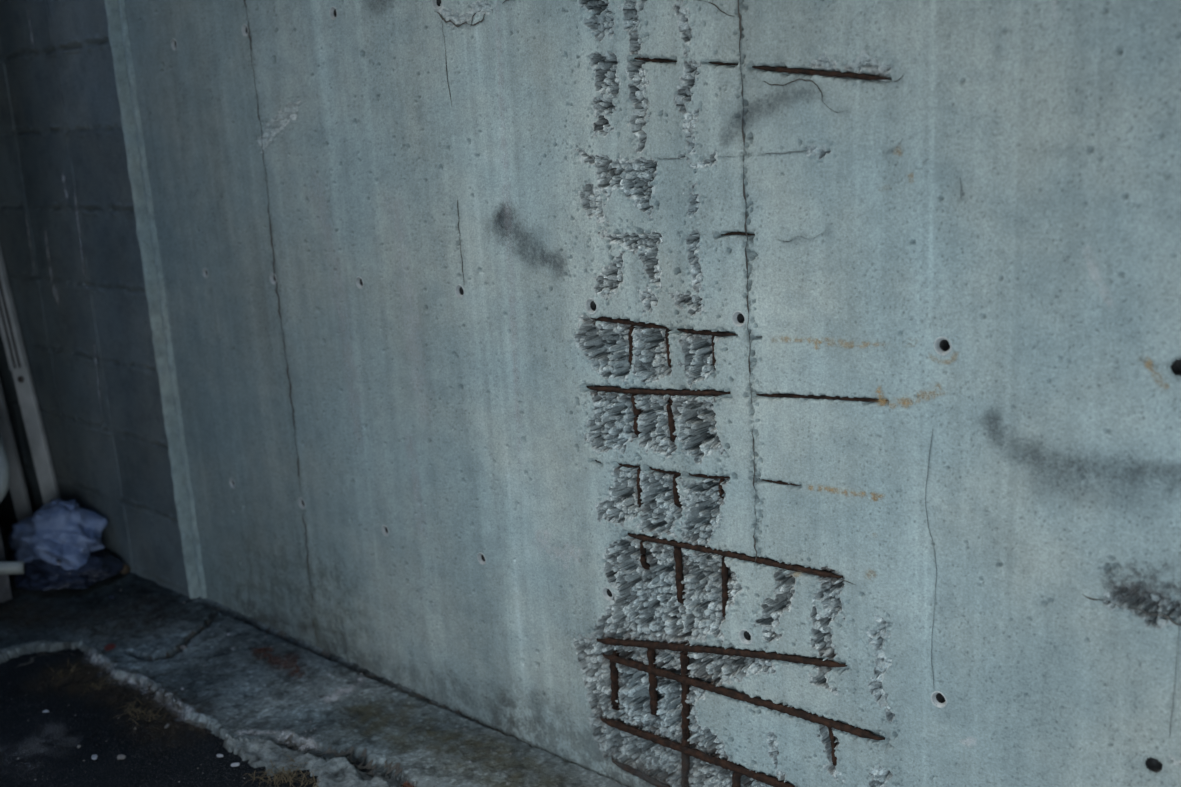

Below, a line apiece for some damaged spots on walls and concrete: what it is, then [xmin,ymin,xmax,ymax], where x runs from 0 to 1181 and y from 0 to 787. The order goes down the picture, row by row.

corrosion [752,66,892,80]
crack [128,0,577,764]
corrosion [586,385,731,443]
corrosion [591,316,738,370]
spalling [573,0,789,787]
crack [700,0,848,562]
corrosion [628,533,843,617]
spalling [752,569,797,643]
spalling [807,566,846,696]
crack [925,431,937,686]
spalling [1103,581,1181,630]
corrosion [596,638,885,787]